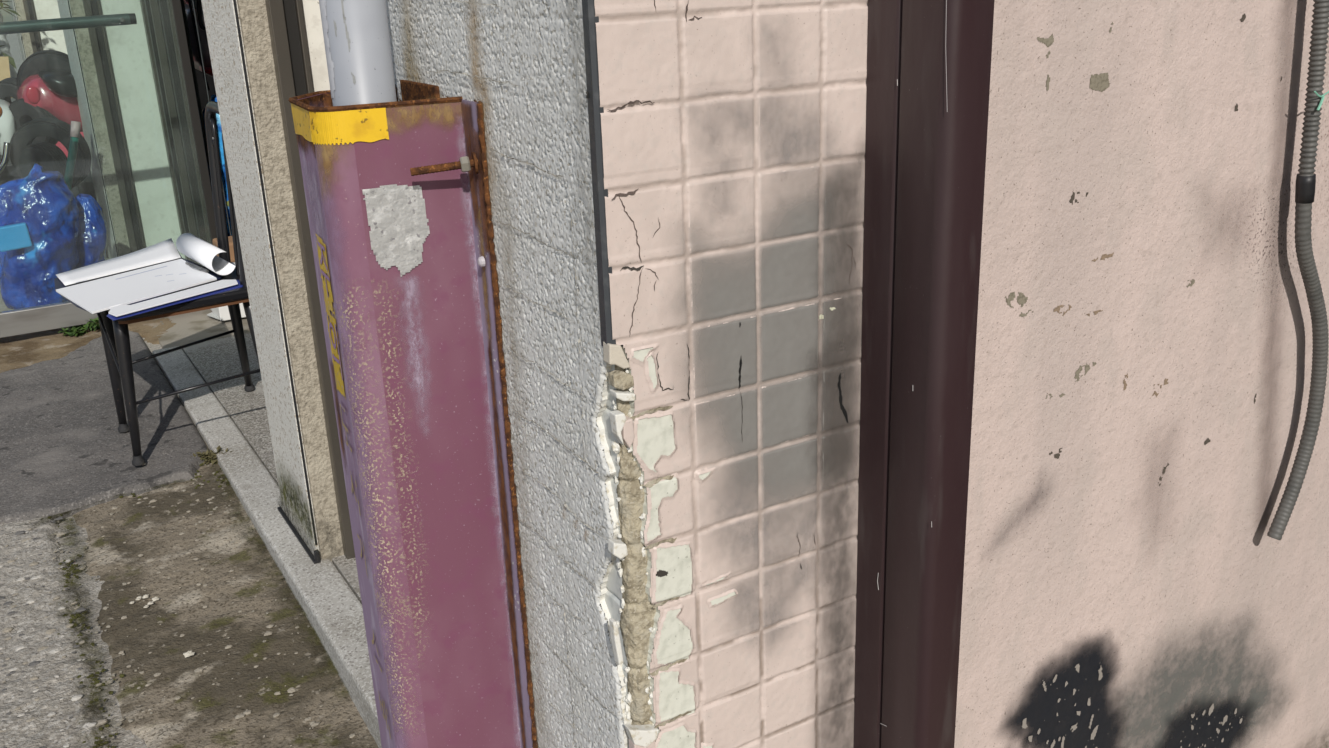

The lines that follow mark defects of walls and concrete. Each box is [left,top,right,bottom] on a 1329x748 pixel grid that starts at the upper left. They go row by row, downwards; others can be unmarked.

corrosion [288,85,538,748]
crack [612,189,660,337]
spalling [596,342,738,748]